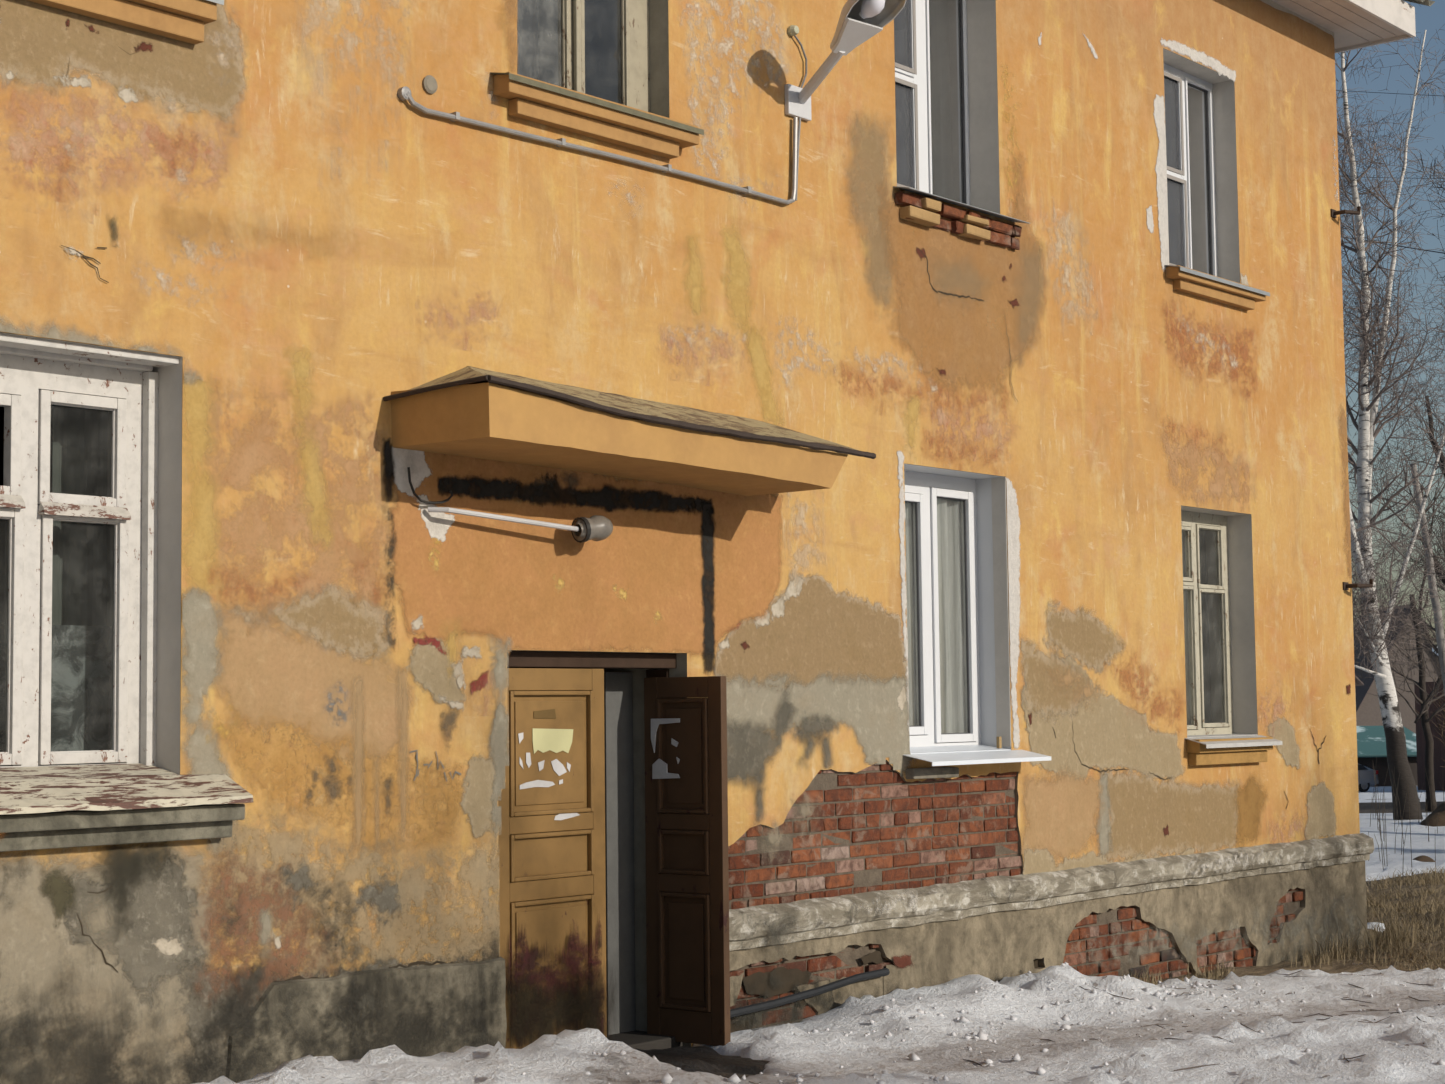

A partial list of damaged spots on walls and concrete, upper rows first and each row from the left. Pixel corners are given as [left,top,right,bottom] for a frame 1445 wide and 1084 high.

flaking render [0,0,245,122]
flaking render [182,585,482,778]
flaking render [713,574,907,711]
spalling [728,640,1266,912]
water stain [42,871,74,918]
spalling [1063,888,1303,983]
water stain [0,964,498,1084]